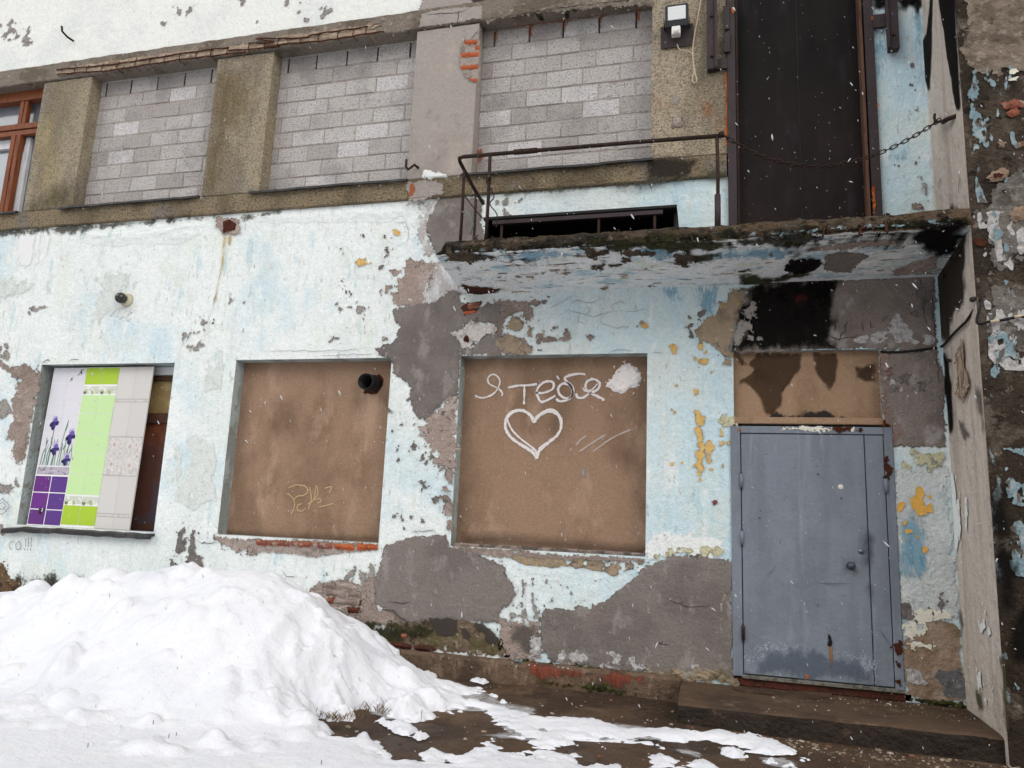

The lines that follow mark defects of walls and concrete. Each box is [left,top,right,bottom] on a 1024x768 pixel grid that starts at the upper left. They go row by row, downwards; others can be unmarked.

peeling [967,65,1019,151]
peeling [0,343,44,495]
peeling [355,199,572,359]
peeling [685,269,771,374]
damp [739,273,822,319]
damp [738,353,845,418]
damp [856,364,903,391]
rust [883,456,893,480]
damp [853,314,935,345]
peeling [973,177,1024,378]
spalling [166,522,724,667]
peeling [895,448,968,704]